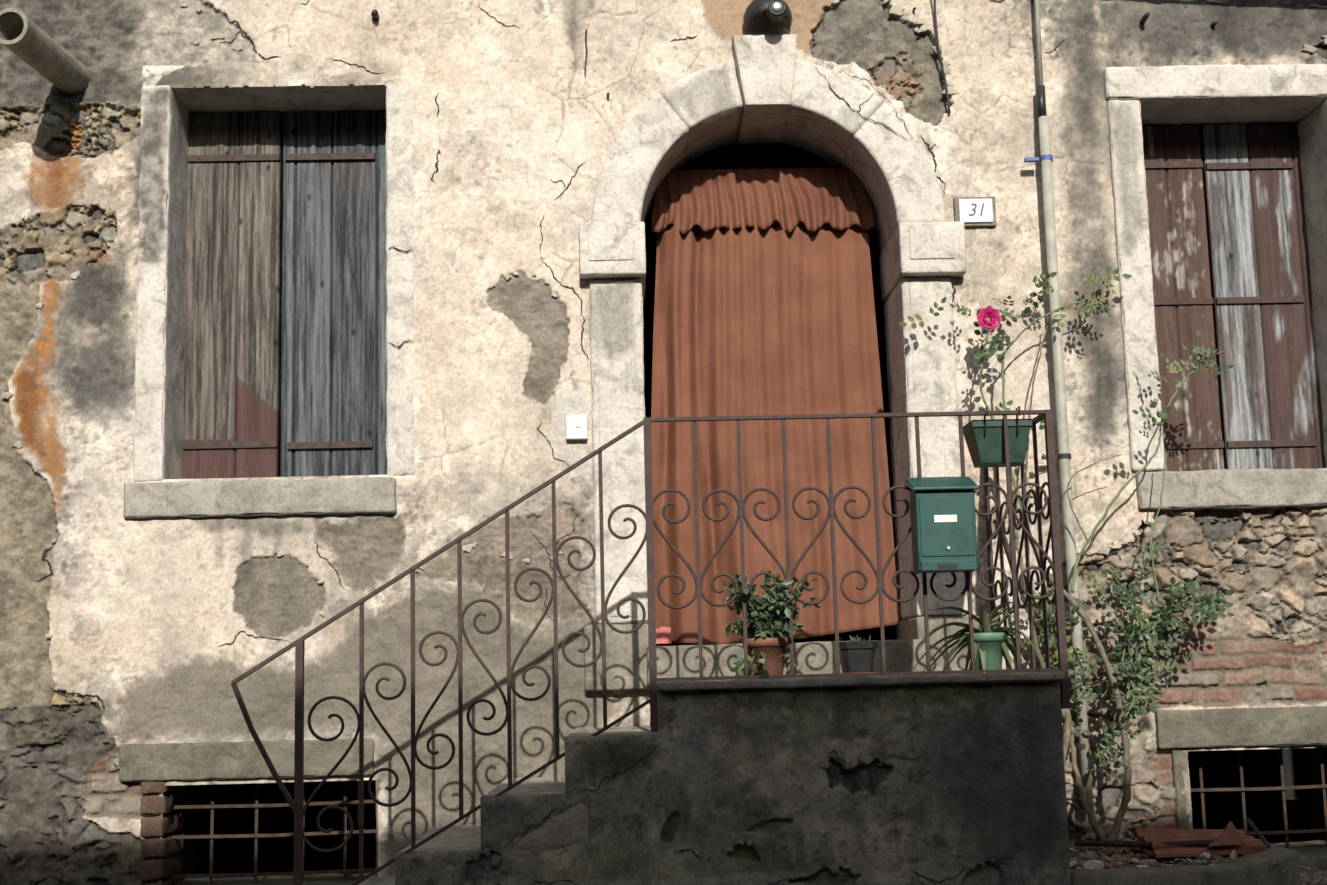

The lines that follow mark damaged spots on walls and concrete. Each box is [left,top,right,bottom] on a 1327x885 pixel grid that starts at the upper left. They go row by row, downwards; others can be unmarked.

flaking render [809,0,958,126]
flaking render [1301,35,1327,59]
crack [812,63,946,197]
flaking render [487,271,570,405]
flaking render [232,551,326,639]
flaking render [314,514,406,595]
flaking render [415,503,592,626]
flaking render [1133,512,1154,536]
flaking render [82,746,163,819]
flaking render [818,755,892,796]
flaking render [725,818,792,861]
crack [912,856,1022,883]